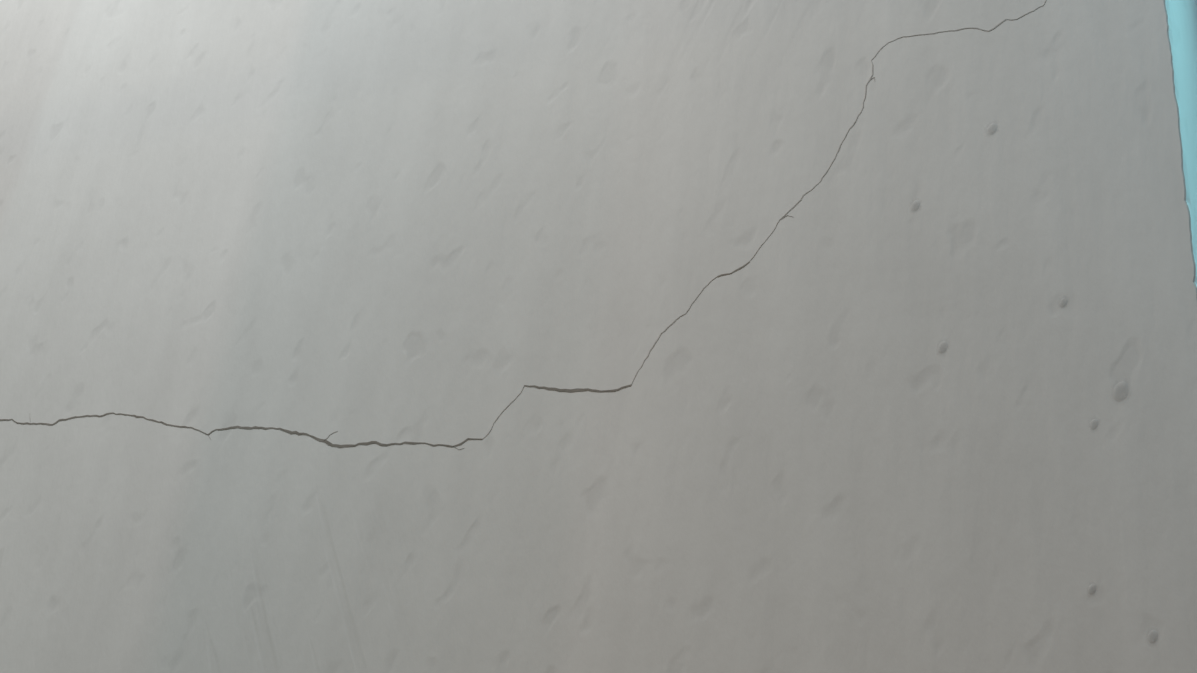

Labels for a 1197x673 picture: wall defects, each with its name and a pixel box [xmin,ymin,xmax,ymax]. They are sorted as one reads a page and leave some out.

crack [0,1,1046,450]